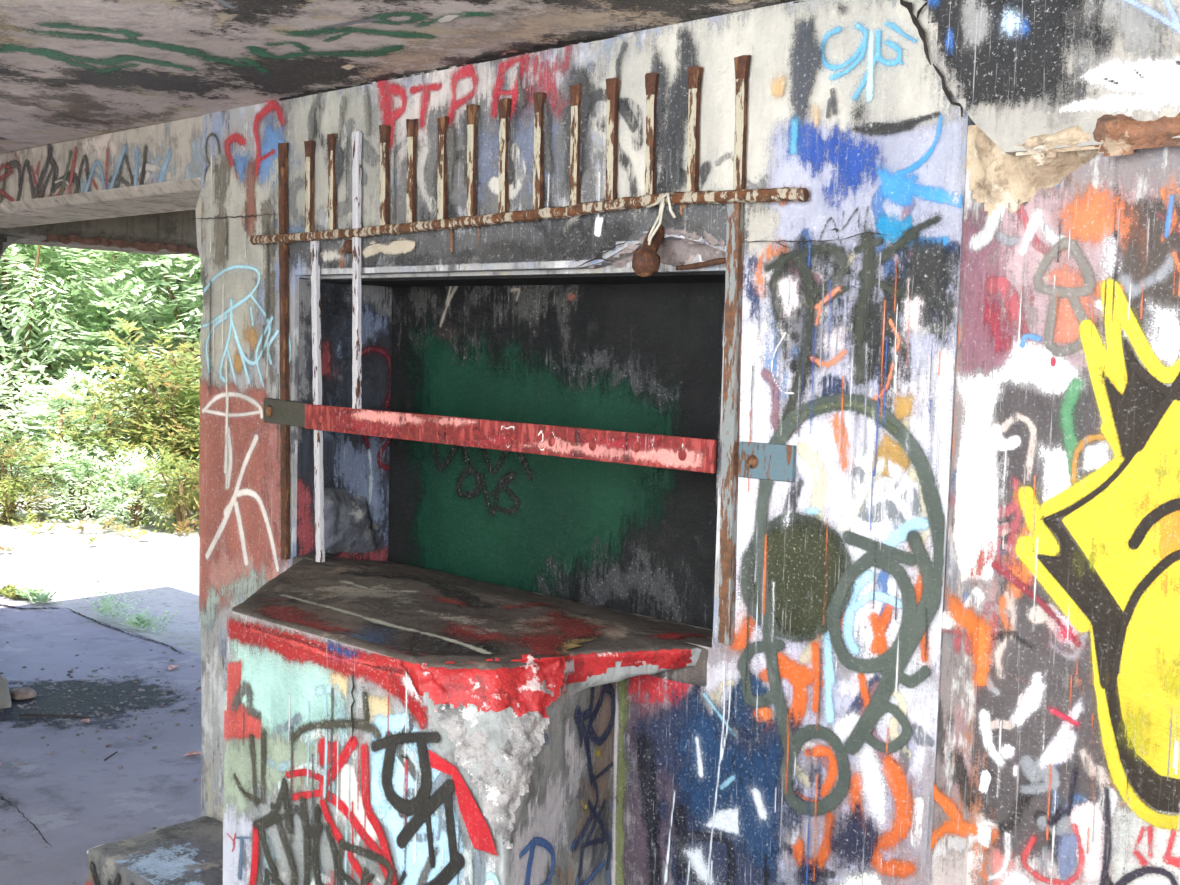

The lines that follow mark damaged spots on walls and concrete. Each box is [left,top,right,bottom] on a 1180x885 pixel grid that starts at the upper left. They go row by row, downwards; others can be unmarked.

crack [279,33,635,101]
rust [771,75,785,97]
crack [900,0,963,117]
spalling [966,56,1180,216]
peeling [298,279,392,409]
spalling [251,431,614,849]
crack [0,796,52,847]